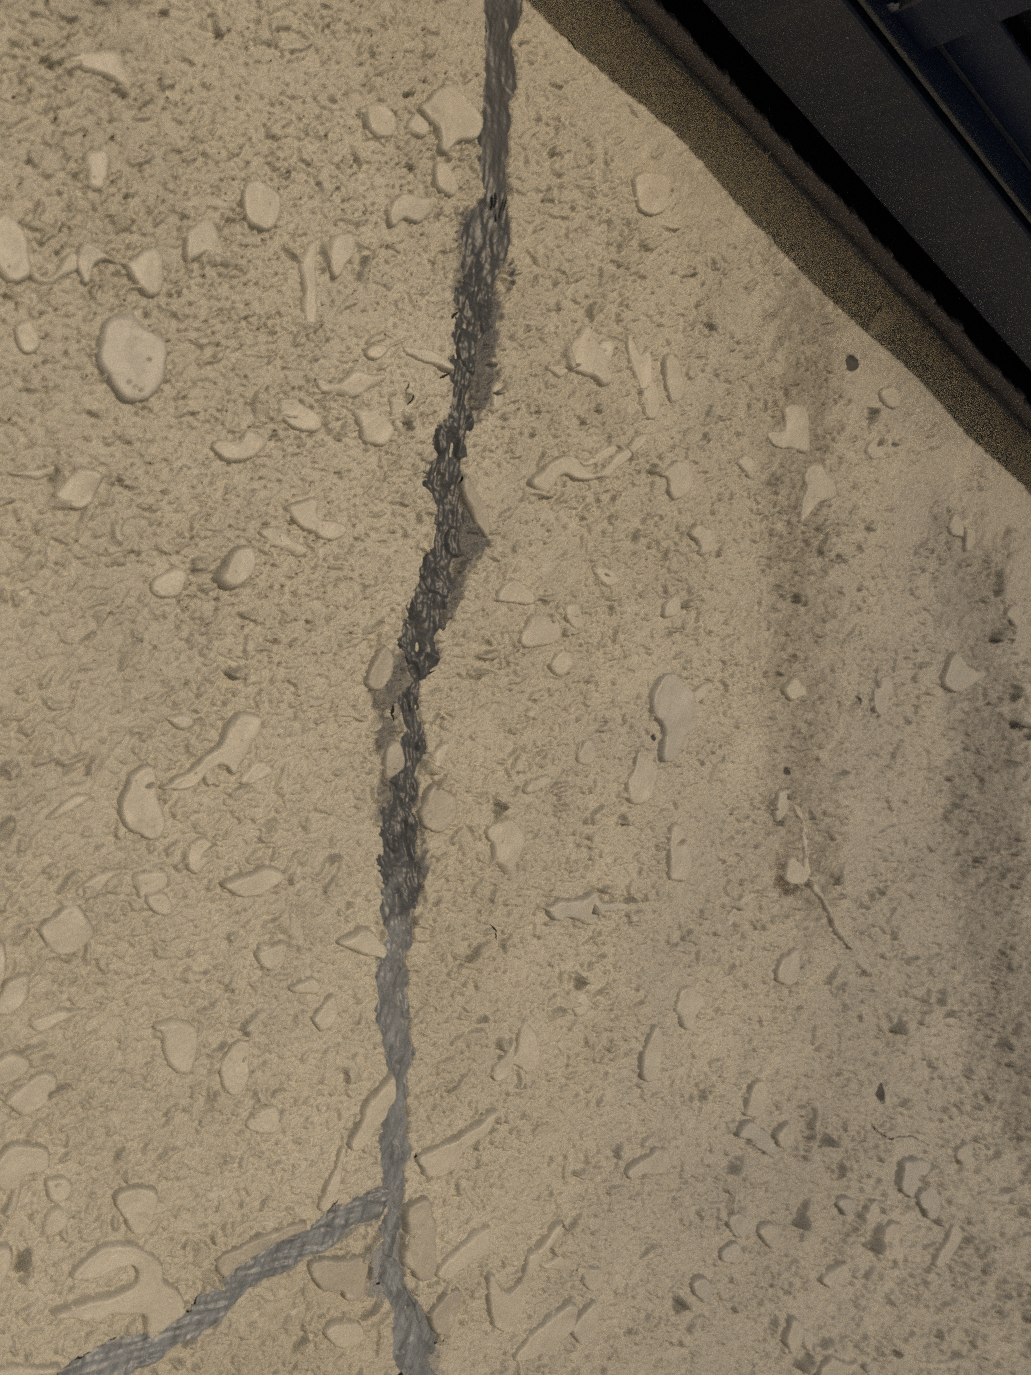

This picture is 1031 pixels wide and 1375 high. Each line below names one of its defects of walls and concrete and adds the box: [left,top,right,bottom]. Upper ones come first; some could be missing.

crack [57,0,523,1375]